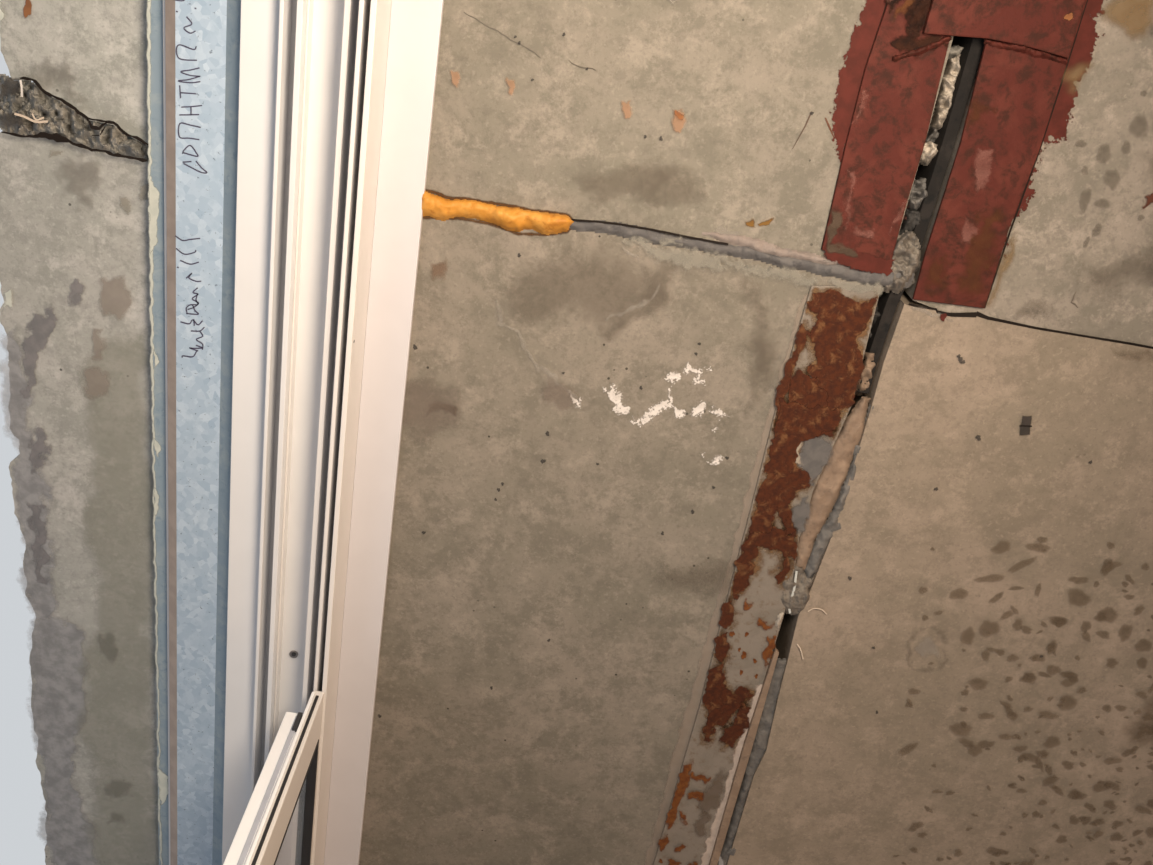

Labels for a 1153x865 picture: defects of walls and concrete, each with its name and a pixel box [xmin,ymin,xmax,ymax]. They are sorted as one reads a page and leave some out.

rust [886,0,948,57]
rust [1107,0,1153,35]
water stain [602,362,729,432]
rust [700,288,878,751]
water stain [979,537,1046,581]
water stain [1071,543,1119,604]
water stain [953,576,1153,865]
rust [658,764,711,865]